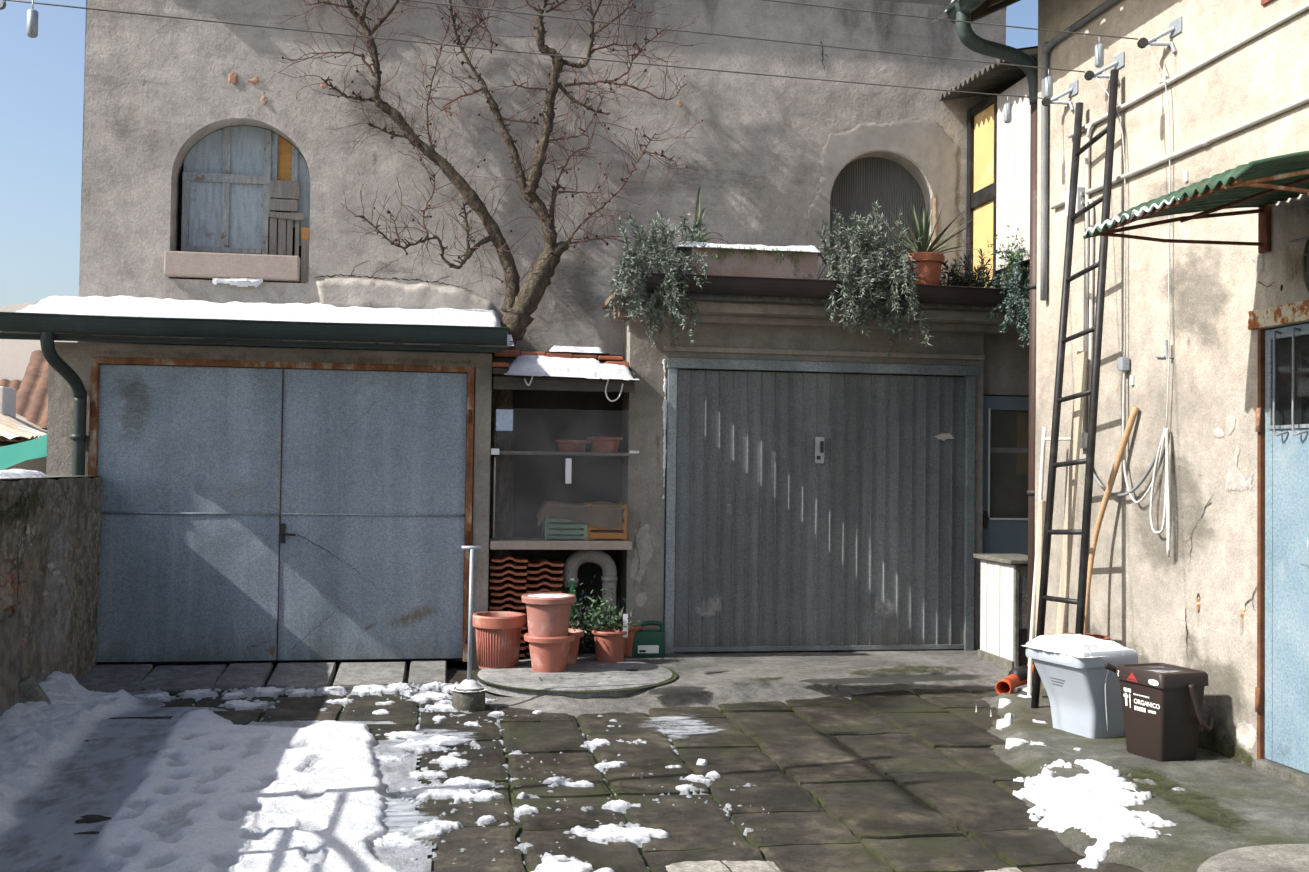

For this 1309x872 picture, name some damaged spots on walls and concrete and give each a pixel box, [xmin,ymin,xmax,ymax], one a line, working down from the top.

leakage [1142,463,1202,563]
leakage [1191,648,1240,728]